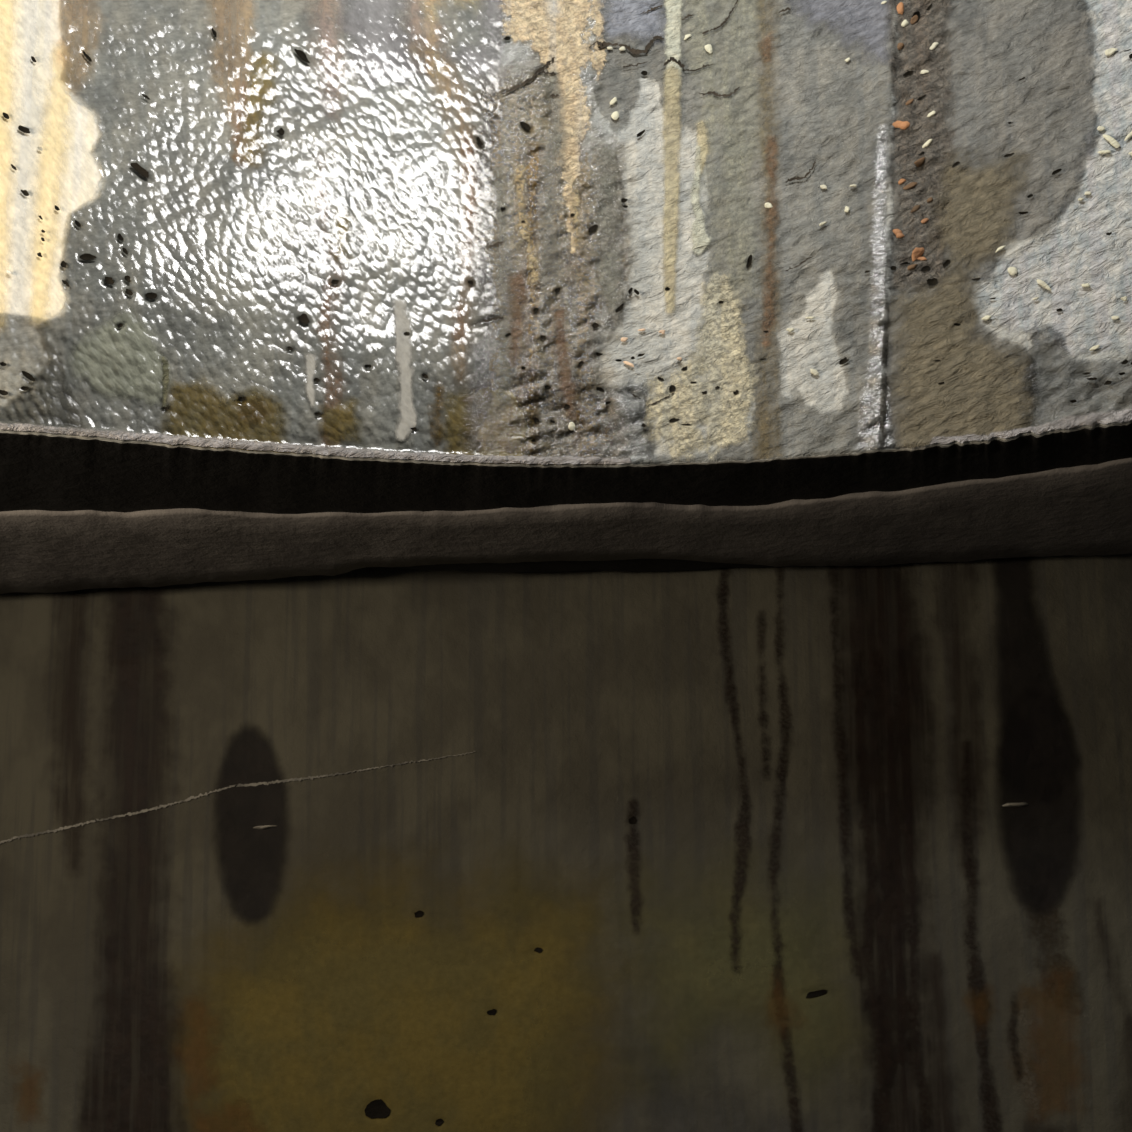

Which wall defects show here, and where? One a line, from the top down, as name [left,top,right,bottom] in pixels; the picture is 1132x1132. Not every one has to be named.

leakage [788,0,891,61]
leakage [971,0,1132,356]
leakage [80,587,171,1132]
crack [0,751,475,844]
leakage [730,757,750,969]
leakage [760,682,802,1132]
leakage [831,564,953,1132]